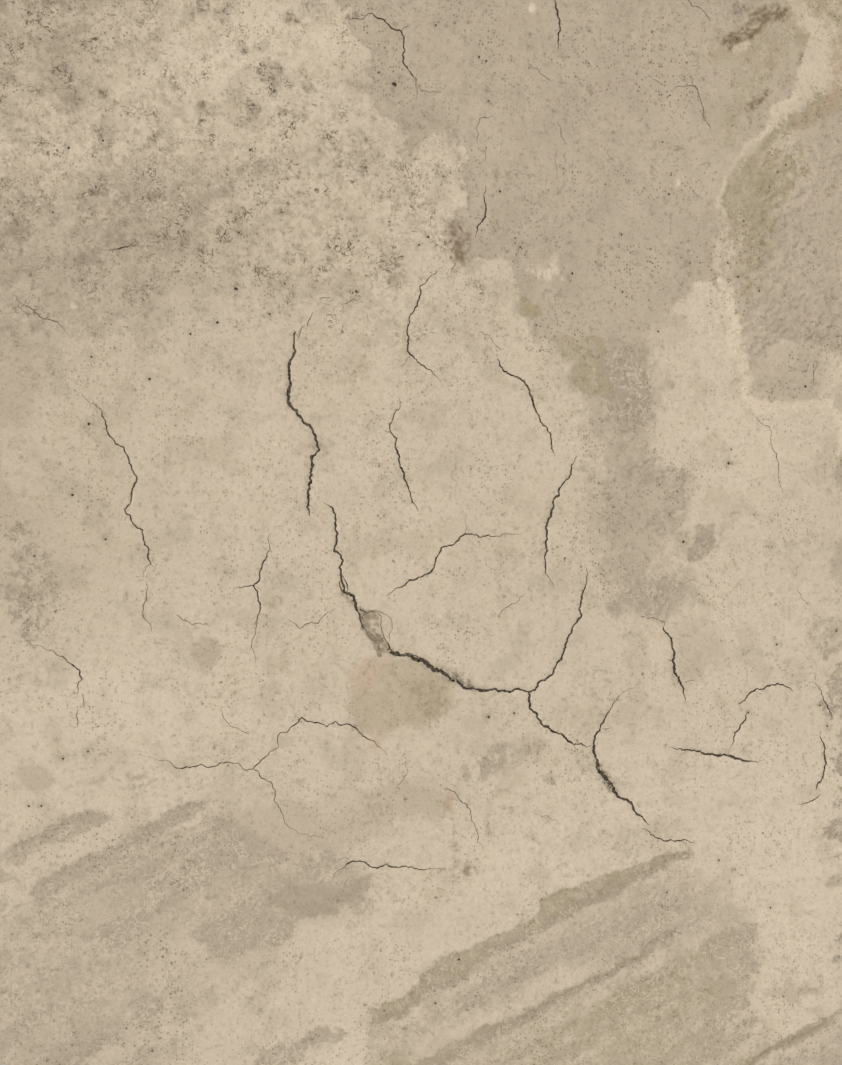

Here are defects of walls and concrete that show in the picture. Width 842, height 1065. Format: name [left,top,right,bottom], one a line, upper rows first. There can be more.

crack [402,263,456,380]
crack [82,394,154,629]
crack [234,536,270,662]
crack [287,297,694,848]
water stain [0,797,220,898]
crack [140,717,446,883]
water stain [264,874,381,920]
water stain [360,846,763,1065]
crack [669,683,832,805]
water stain [30,988,168,1065]
water stain [251,1024,347,1065]
water stain [739,1007,842,1065]